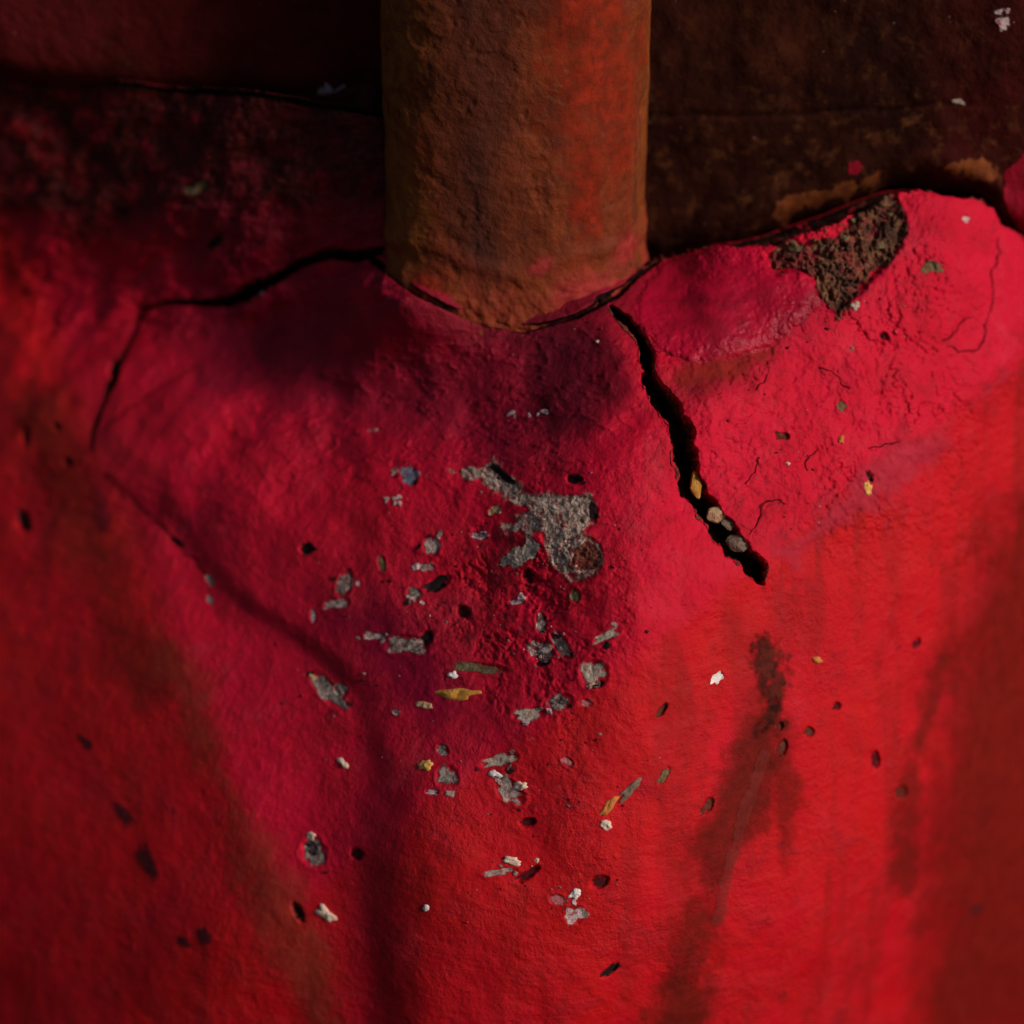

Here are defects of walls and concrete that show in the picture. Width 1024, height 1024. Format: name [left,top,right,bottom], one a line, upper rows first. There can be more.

spalling [769,194,909,320]
crack [54,246,460,451]
crack [495,190,931,583]
peeling [404,530,447,606]
spalling [449,456,603,605]
peeling [515,612,607,725]
peeling [418,744,458,797]
peeling [475,749,535,825]
peeling [599,777,641,831]
peeling [484,856,539,880]
peeling [292,902,337,922]
peeling [550,888,590,925]